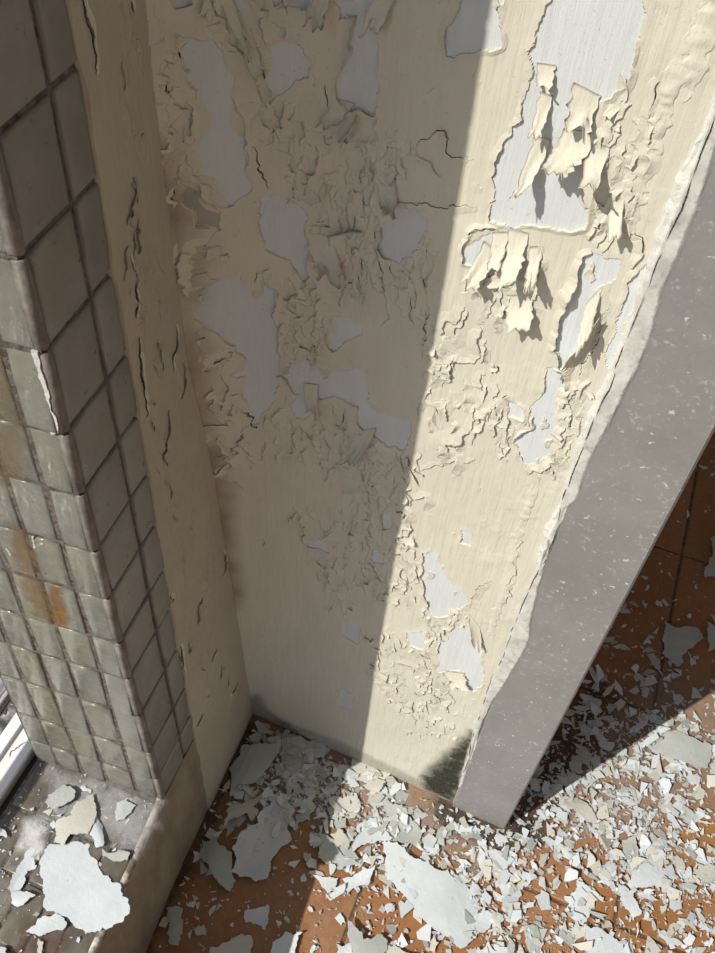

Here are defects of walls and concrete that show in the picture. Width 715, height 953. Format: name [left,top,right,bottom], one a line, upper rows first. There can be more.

peeling [146,0,666,741]
crack [465,117,715,719]
crack [641,77,660,119]
peeling [704,536,715,578]